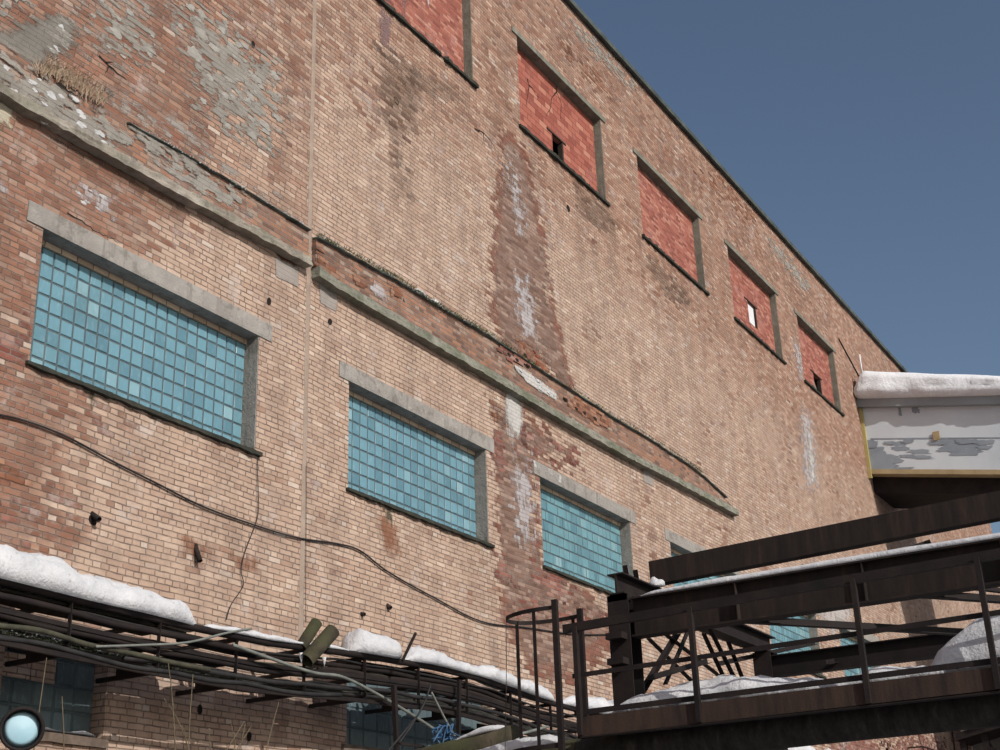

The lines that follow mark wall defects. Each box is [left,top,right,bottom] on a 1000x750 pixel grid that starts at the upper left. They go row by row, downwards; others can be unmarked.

flaking render [0,0,255,218]
flaking render [169,0,290,163]
leakage [381,0,453,166]
leakage [487,129,574,390]
efflorescence [506,393,523,438]
efflorescence [799,409,820,491]
peeling [867,439,995,475]